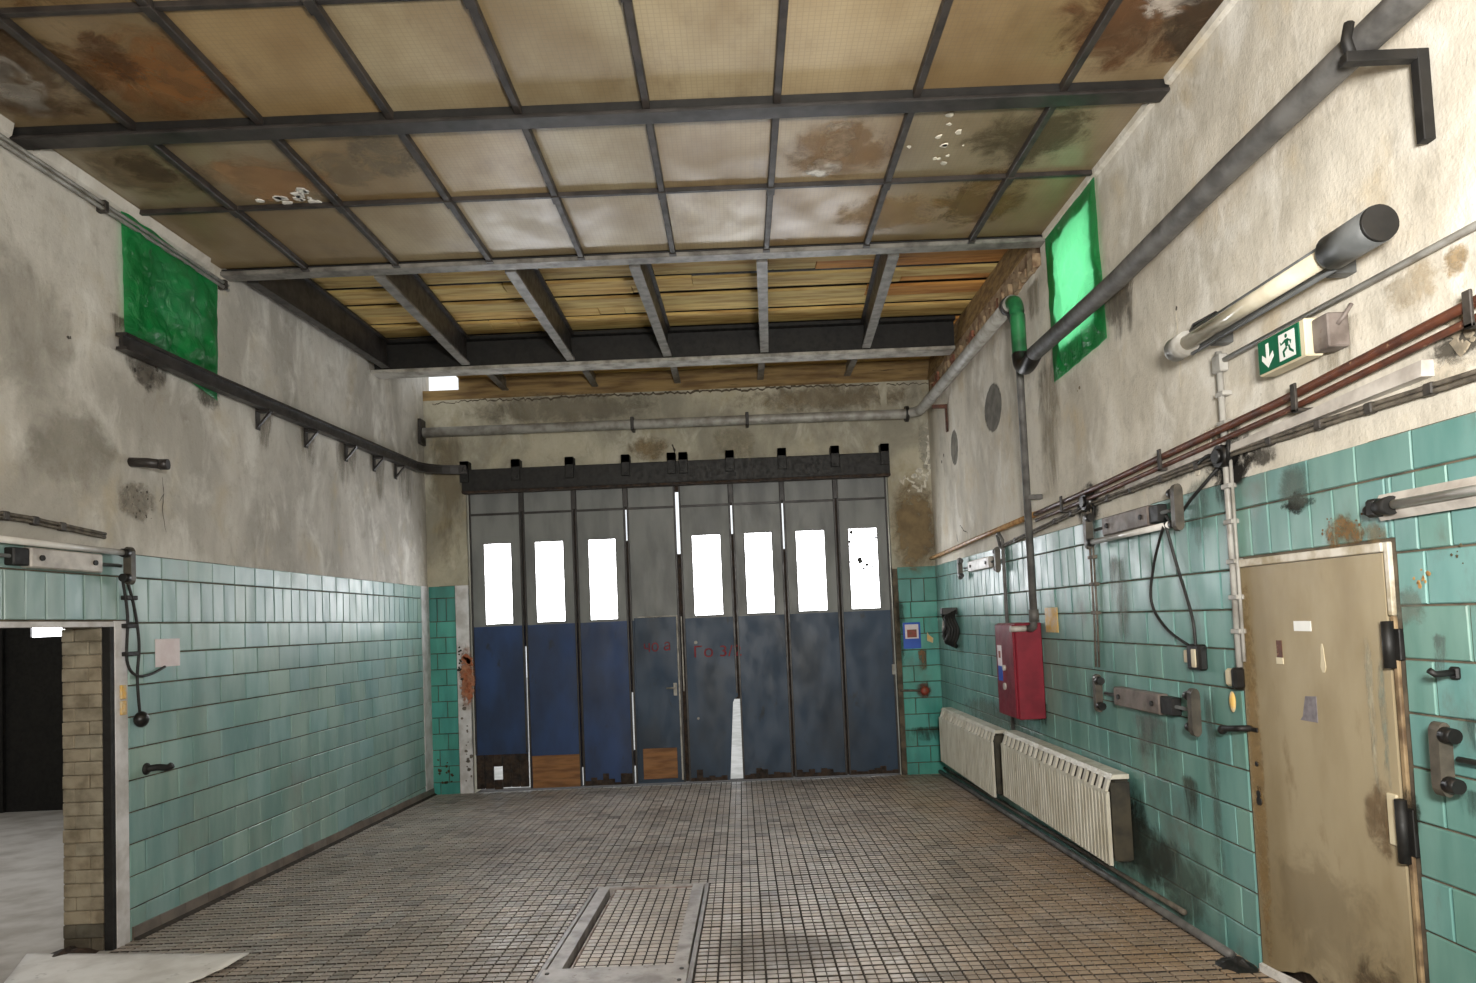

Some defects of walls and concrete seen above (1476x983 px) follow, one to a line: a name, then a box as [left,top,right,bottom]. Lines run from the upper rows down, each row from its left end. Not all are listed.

water stain [1062,0,1223,70]
water stain [1282,492,1311,514]
water stain [1183,777,1197,820]
water stain [1130,793,1209,918]